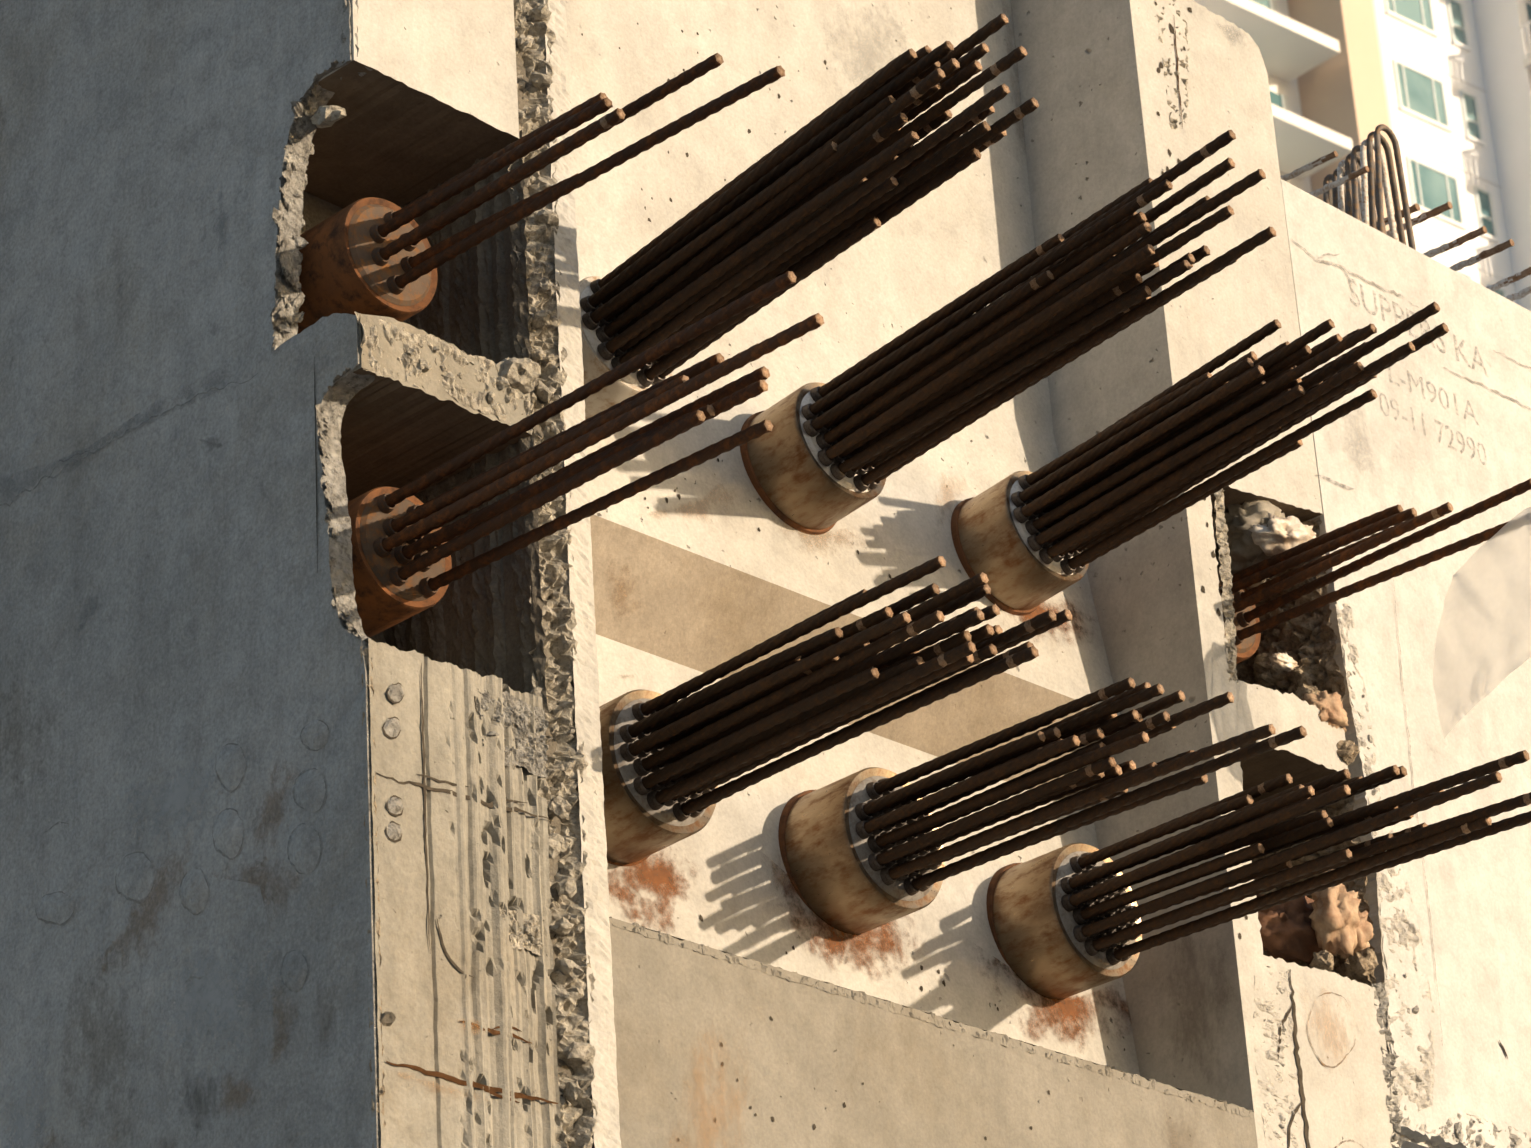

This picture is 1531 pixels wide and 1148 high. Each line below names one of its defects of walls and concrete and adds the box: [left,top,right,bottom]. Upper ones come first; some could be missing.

spalling [270,0,359,351]
spalling [315,0,586,1148]
spalling [1335,603,1383,804]
crack [386,1061,558,1104]
rust [608,854,685,929]
rust [784,875,902,975]
spalling [476,482,1355,1148]
rust [1016,974,1131,1040]
crack [1278,969,1311,1148]
spalling [1372,864,1531,1148]